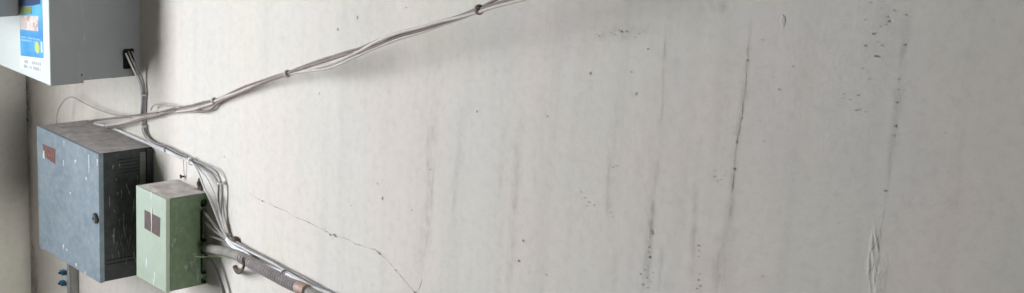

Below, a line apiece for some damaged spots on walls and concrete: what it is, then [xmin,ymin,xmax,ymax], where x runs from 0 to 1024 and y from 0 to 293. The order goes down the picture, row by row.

crack [250,193,422,293]